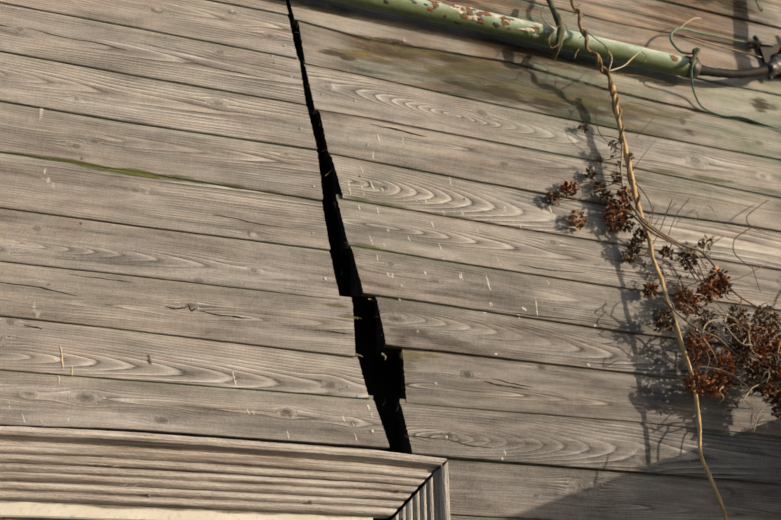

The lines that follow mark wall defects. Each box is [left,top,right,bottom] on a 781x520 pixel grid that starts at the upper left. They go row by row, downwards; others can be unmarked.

crack [286,0,412,454]
rust [427,0,514,29]